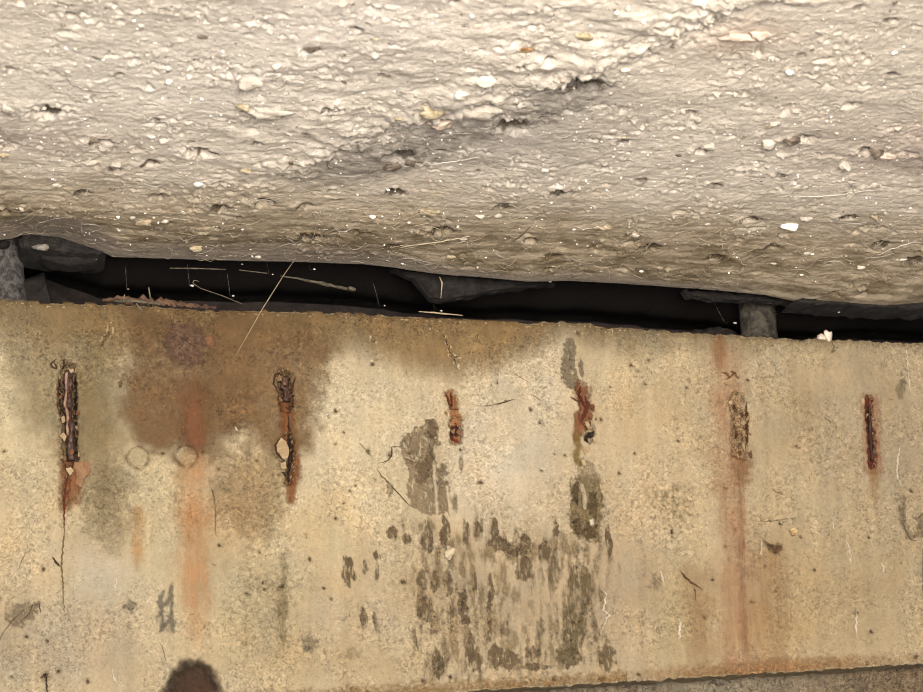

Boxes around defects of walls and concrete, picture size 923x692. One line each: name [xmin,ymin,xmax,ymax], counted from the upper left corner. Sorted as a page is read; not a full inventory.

leakage [560,325,666,391]
leakage [0,300,563,532]
spalling [728,393,752,476]
corrosion [861,395,881,478]
leakage [342,551,381,588]
leakage [386,418,620,682]
leakage [359,607,377,629]
leakage [164,661,219,692]